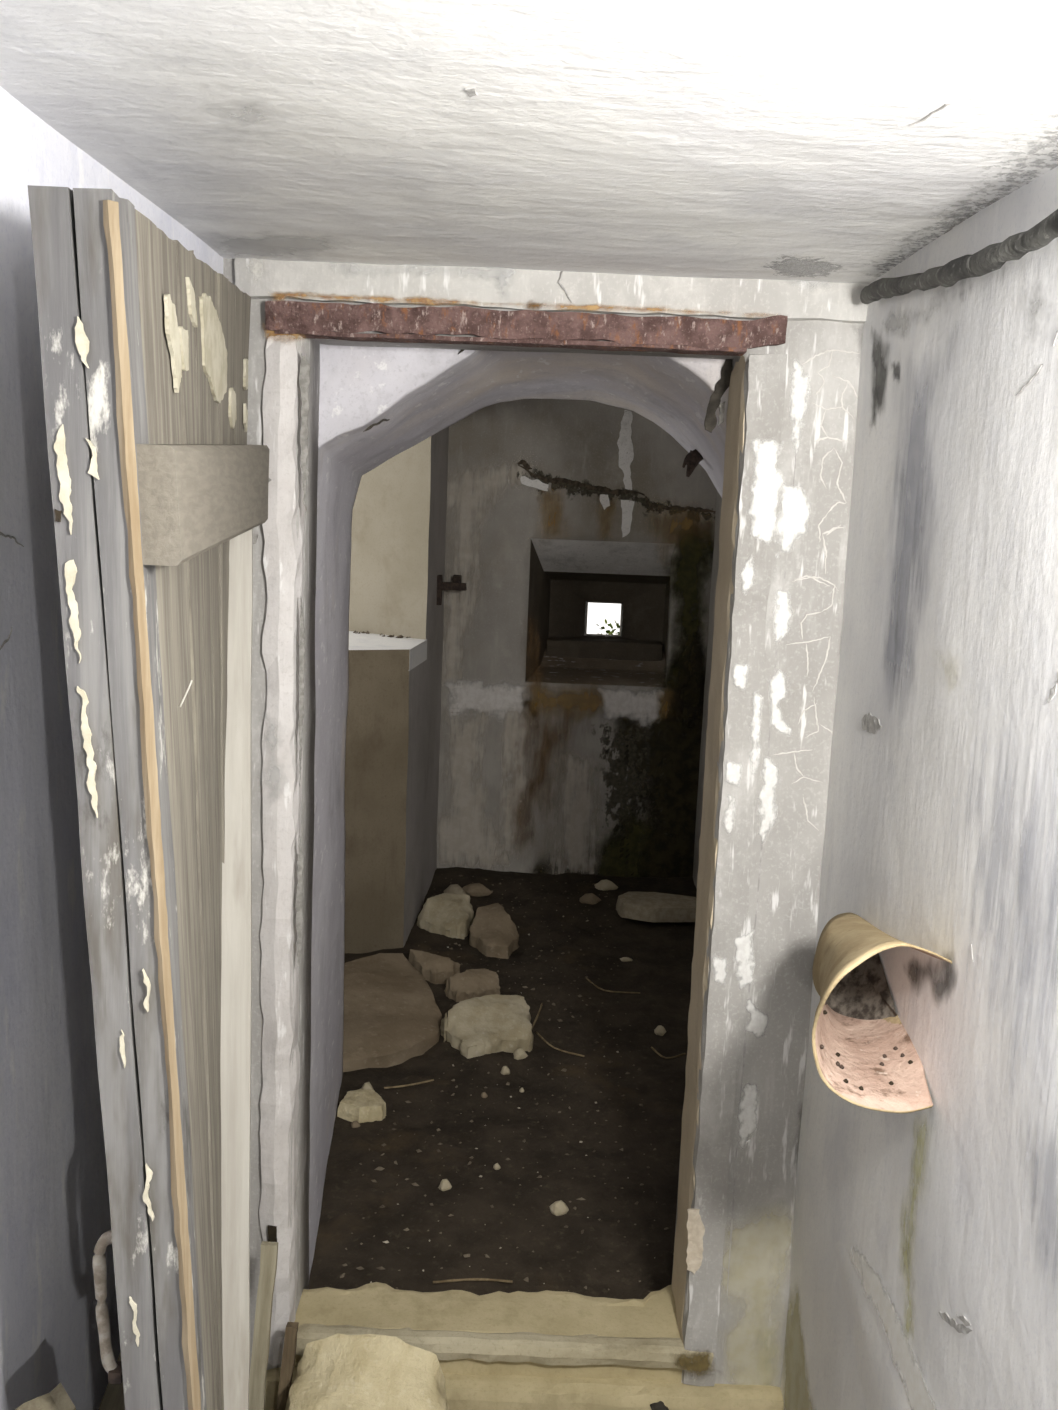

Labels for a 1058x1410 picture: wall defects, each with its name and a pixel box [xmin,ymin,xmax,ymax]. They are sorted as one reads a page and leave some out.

rust [275,292,476,305]
peeling [164,277,248,432]
peeling [520,476,549,491]
peeling [749,361,810,551]
peeling [741,557,754,590]
peeling [774,590,792,641]
damp [495,711,532,858]
damp [592,634,705,878]
peeling [724,664,791,841]
peeling [713,932,768,1038]
peeling [738,1084,757,1148]